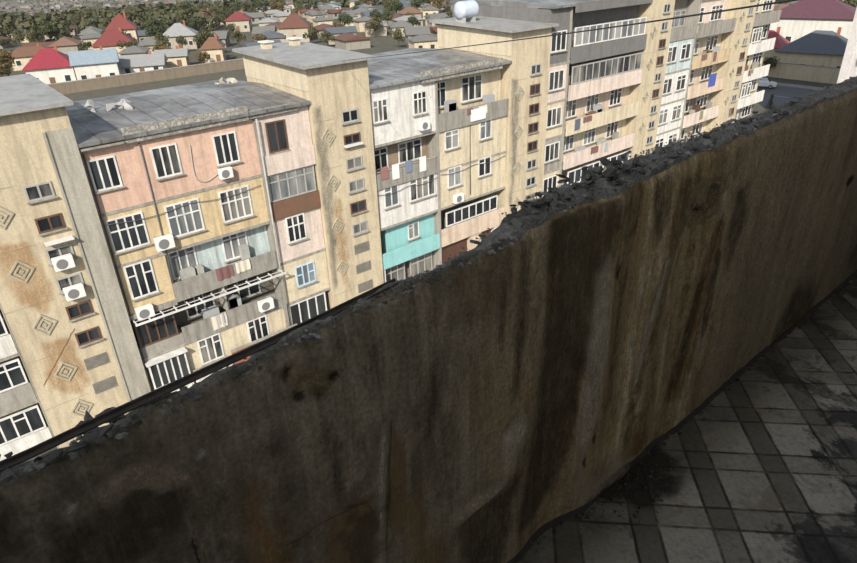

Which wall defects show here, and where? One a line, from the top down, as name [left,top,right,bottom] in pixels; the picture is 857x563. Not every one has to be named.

water stain [467,201,621,563]